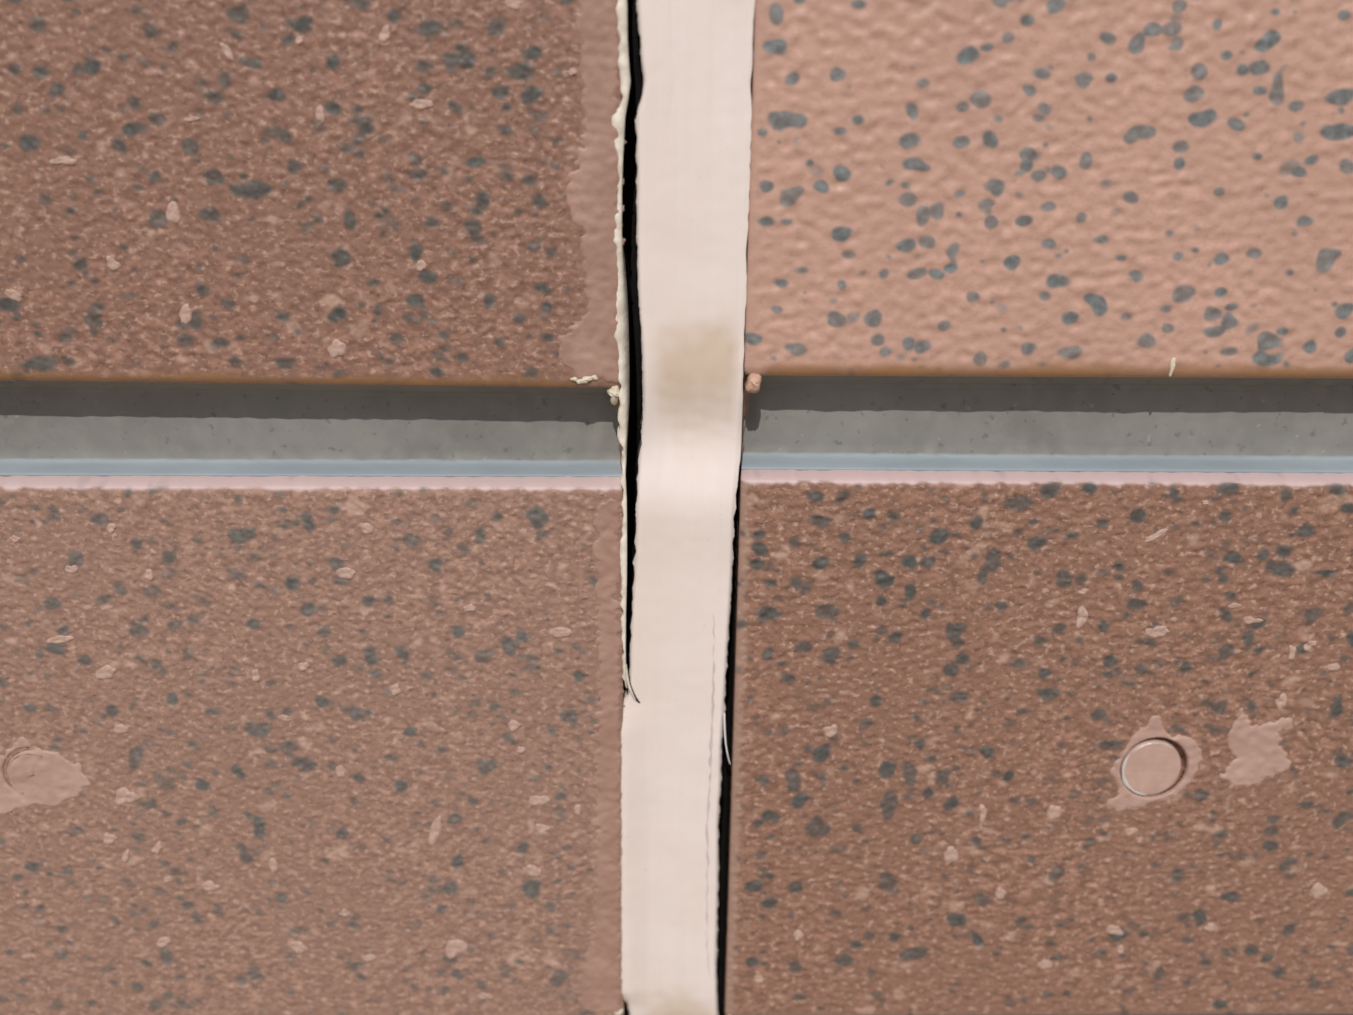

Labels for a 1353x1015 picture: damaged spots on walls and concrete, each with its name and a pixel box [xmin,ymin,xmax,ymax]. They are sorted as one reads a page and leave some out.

crack [612,0,643,703]
crack [716,362,744,1015]